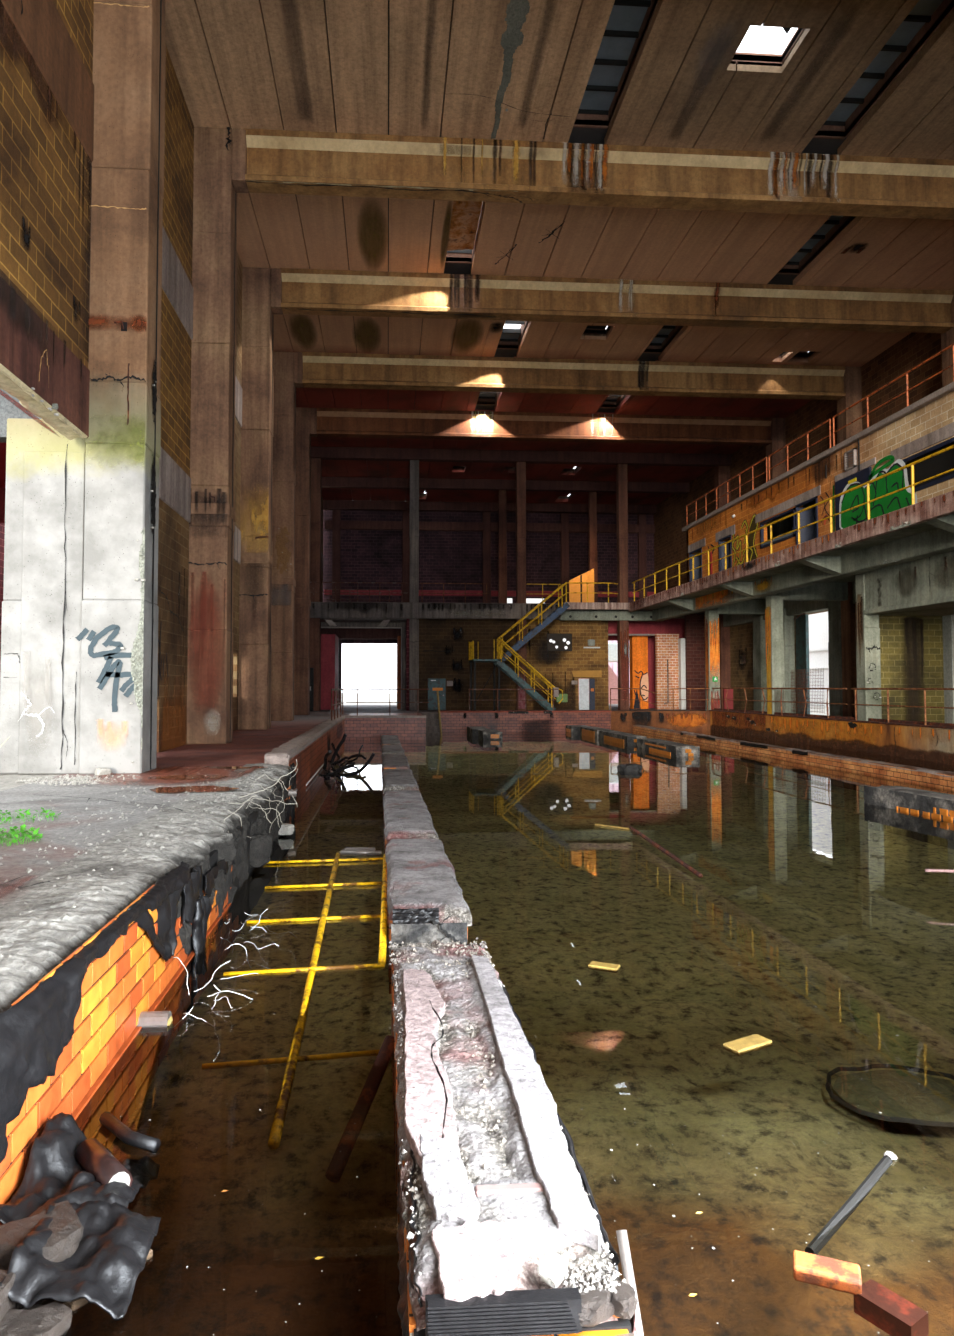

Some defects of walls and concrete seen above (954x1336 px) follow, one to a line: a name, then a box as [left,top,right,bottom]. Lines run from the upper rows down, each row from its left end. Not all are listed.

leakage [360,206,385,265]
leakage [441,206,488,351]
leakage [0,269,66,362]
rust [89,316,147,331]
leakage [291,315,315,347]
leakage [355,320,379,350]
crack [90,374,146,392]
rust [634,495,946,745]
spalling [0,763,297,1013]
spalling [576,1280,638,1327]